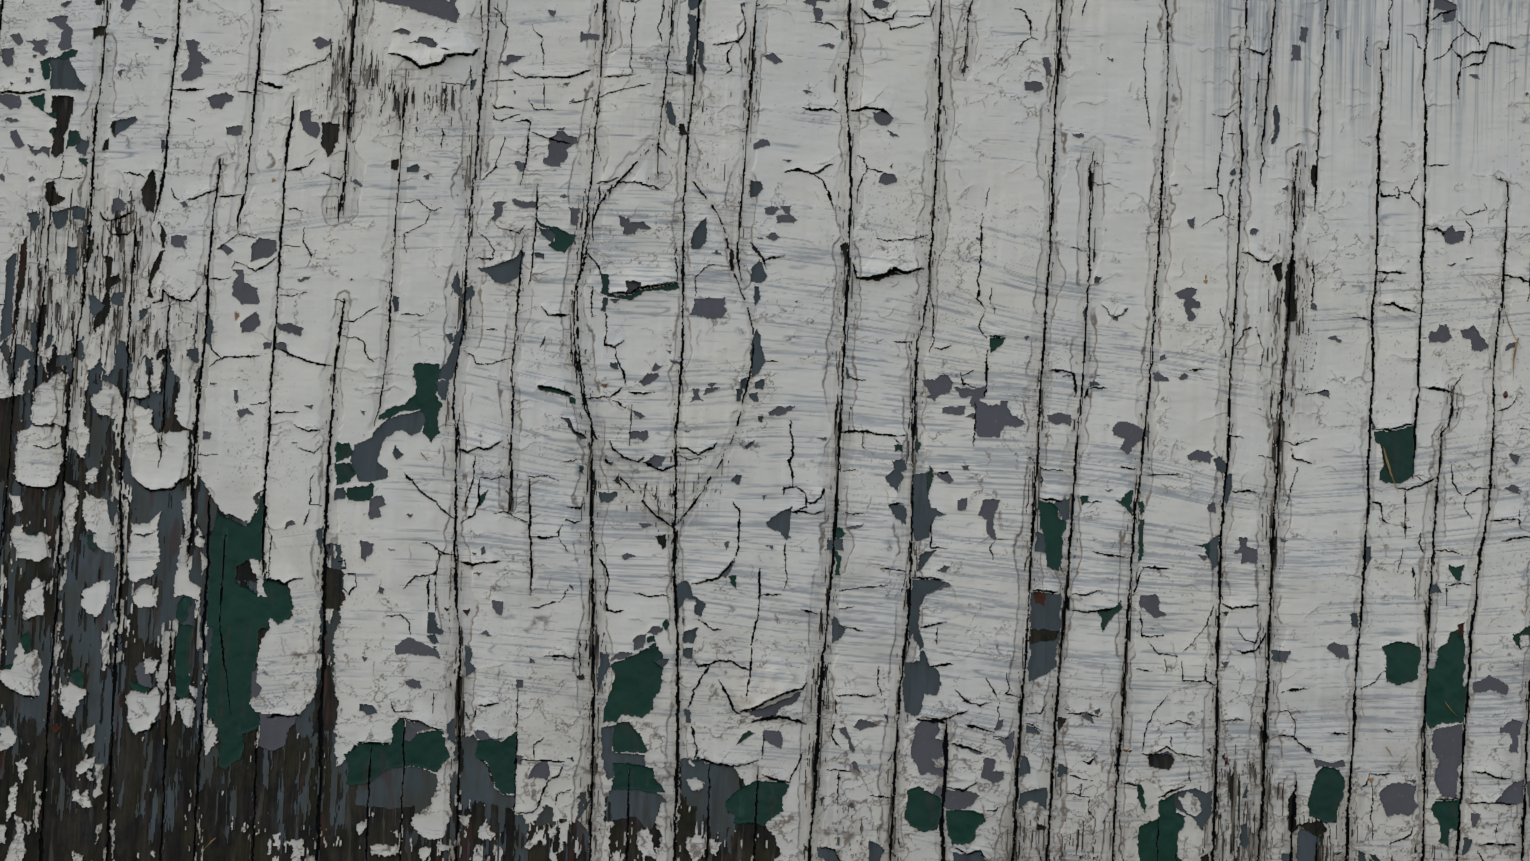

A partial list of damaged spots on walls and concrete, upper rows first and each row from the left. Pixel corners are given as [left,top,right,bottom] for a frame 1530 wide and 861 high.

crack [0,0,265,861]
peeling [0,238,331,699]
peeling [334,194,581,519]
crack [251,0,788,861]
peeling [565,257,717,524]
peeling [923,374,1025,438]
crack [782,0,1530,861]
peeling [0,726,42,861]
peeling [125,631,218,755]
peeling [356,761,495,861]
peeling [817,416,1166,861]
peeling [1261,724,1345,861]